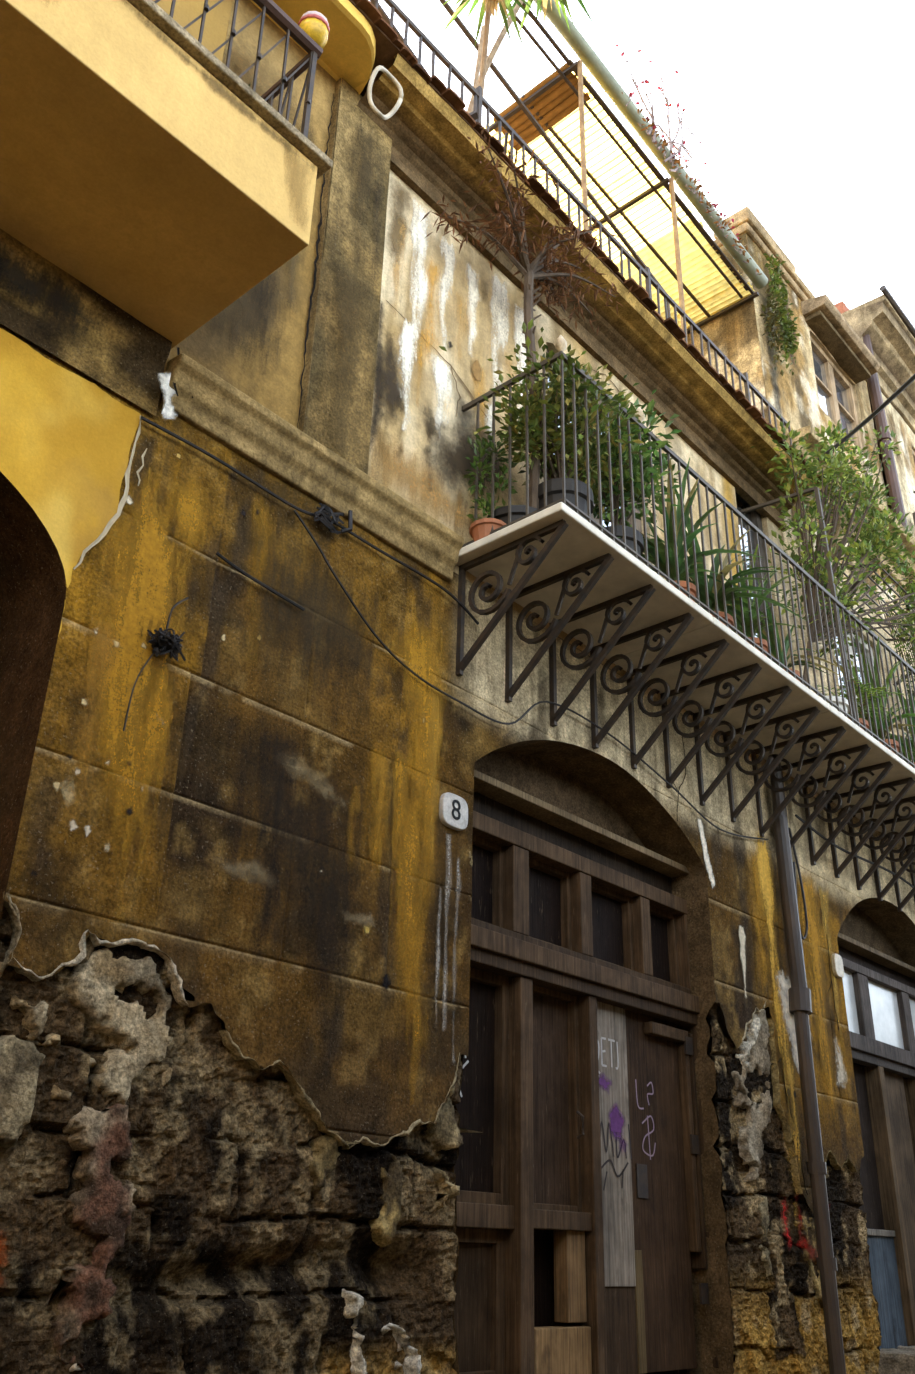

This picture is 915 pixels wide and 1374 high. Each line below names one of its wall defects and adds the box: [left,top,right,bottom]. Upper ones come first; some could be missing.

leakage [370,184,526,524]
leakage [93,477,200,849]
leakage [375,623,439,977]
spalling [0,895,483,1374]
spalling [709,1002,882,1374]